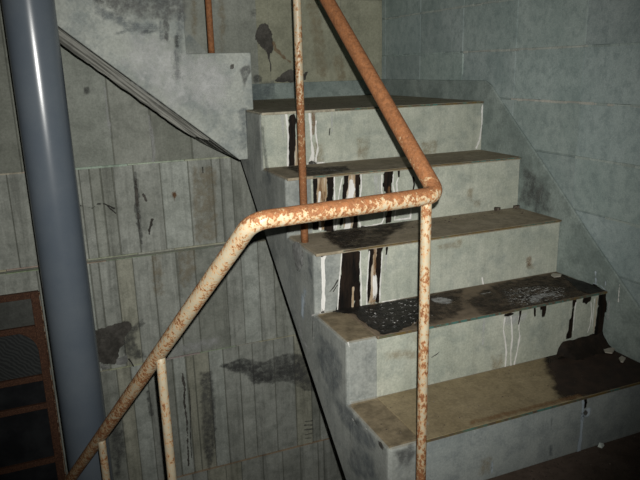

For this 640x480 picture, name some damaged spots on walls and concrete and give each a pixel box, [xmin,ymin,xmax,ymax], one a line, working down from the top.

leakage [281,113,362,203]
leakage [374,171,400,194]
leakage [312,208,419,335]
leakage [429,291,462,321]
leakage [469,271,610,367]
leakage [545,351,640,452]